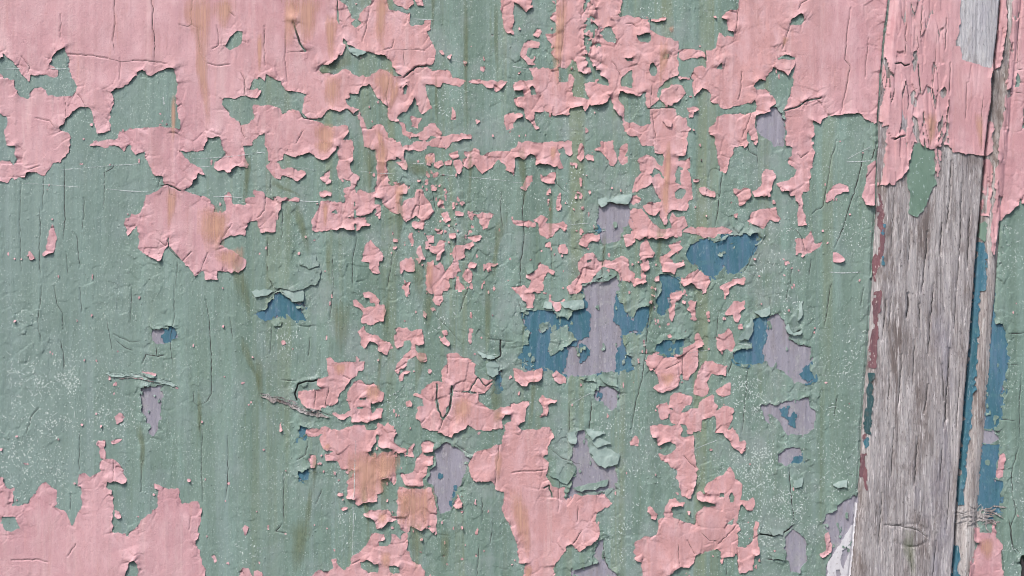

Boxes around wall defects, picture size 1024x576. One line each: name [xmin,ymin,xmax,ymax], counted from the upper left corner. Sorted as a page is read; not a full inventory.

crack [80,0,160,65]
peeling [0,0,628,326]
crack [820,136,904,244]
peeling [500,0,1024,576]
peeling [0,439,217,576]
peeling [140,371,164,436]
crack [287,377,350,415]
peeling [260,330,620,576]